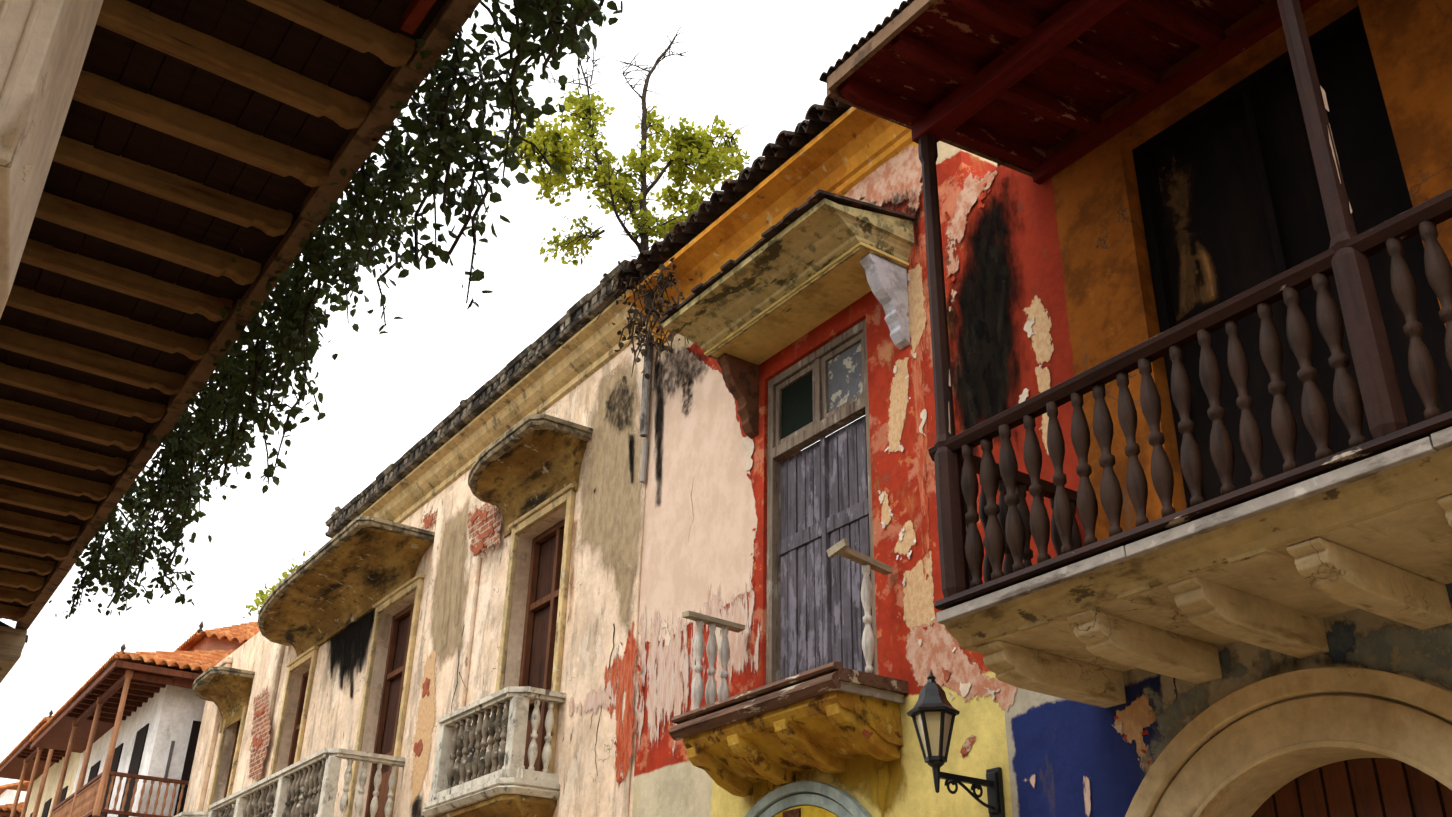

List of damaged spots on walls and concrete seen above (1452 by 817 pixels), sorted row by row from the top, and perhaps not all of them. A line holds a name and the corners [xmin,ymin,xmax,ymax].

water stain [947,180,1020,432]
peeling [1019,295,1054,403]
spalling [467,503,502,559]
water stain [580,346,706,629]
peeling [569,345,761,787]
peeling [878,170,1017,711]
peeling [1039,413,1049,455]
water stain [328,609,375,699]
peeling [1112,694,1156,774]
water stain [1141,620,1452,777]
peeling [1083,776,1091,817]